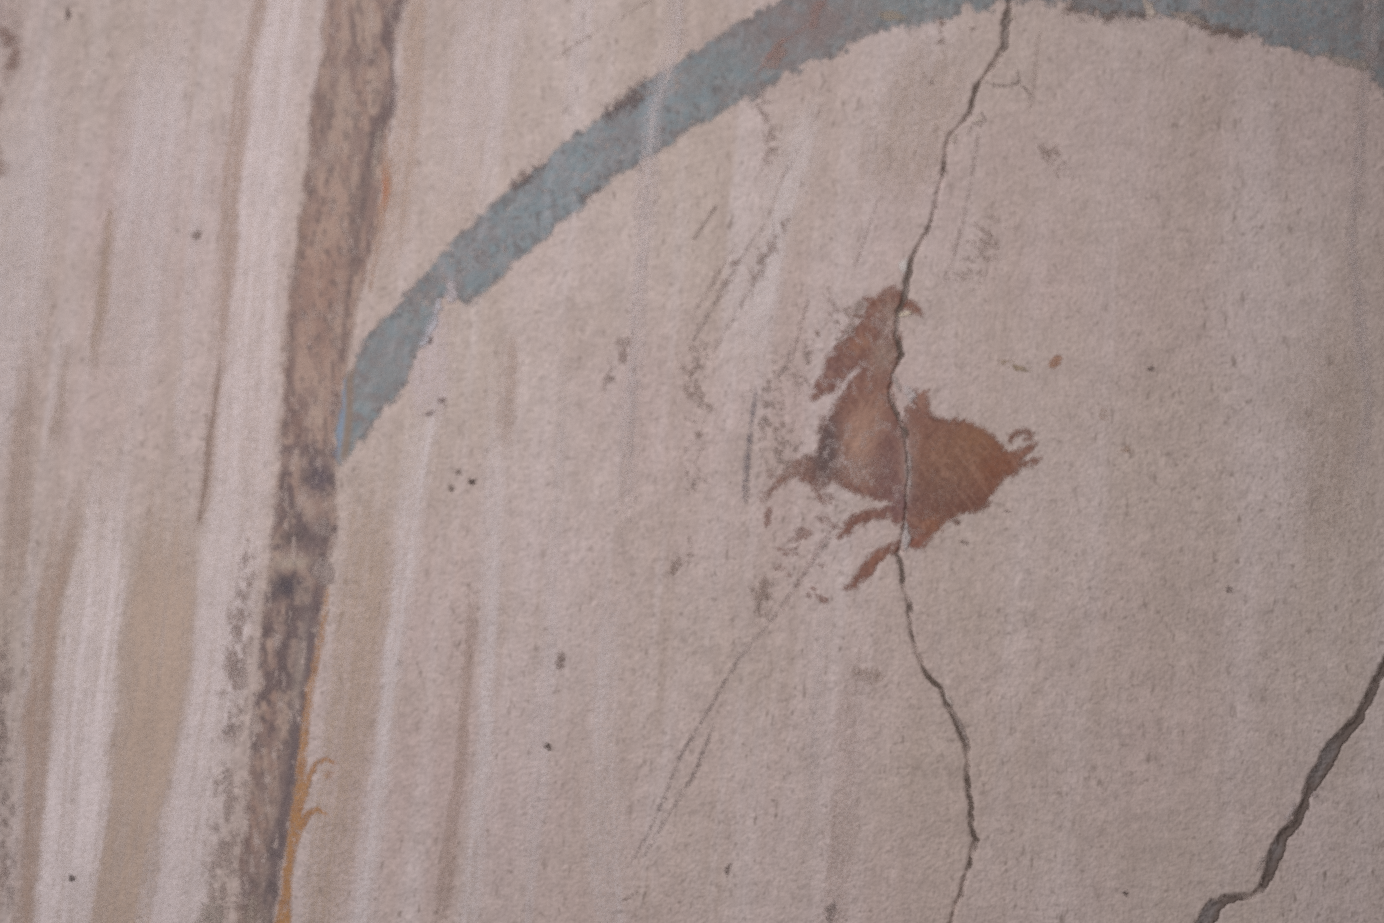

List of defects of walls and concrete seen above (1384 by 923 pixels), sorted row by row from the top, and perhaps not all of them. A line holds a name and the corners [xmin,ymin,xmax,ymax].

crack [888,0,1030,923]
crack [1197,657,1384,923]